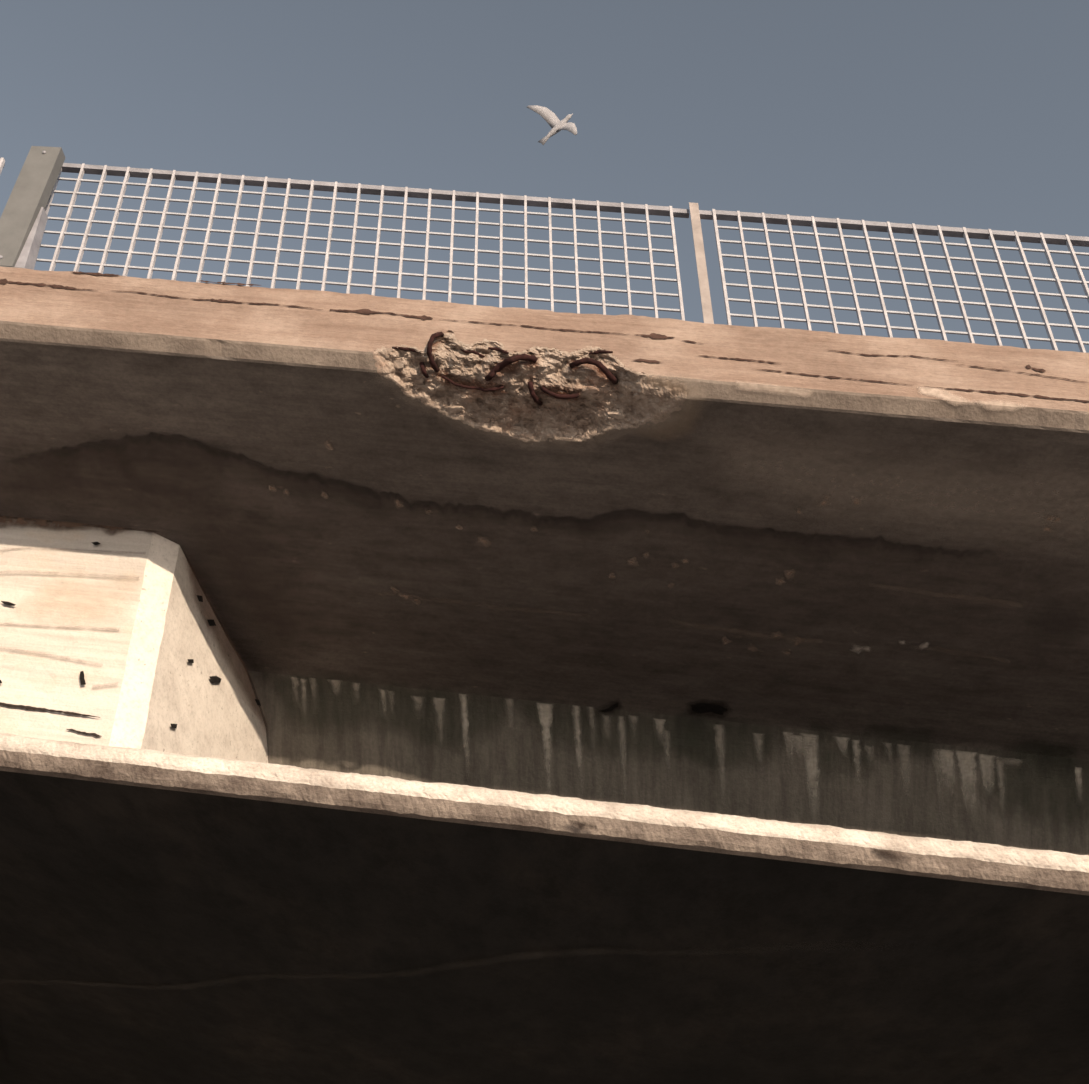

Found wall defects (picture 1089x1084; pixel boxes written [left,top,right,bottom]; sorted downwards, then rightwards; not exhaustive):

spalling [373,332,687,442]
damp [291,677,315,699]
damp [412,696,445,722]
damp [460,694,468,746]
damp [537,703,553,759]
damp [573,705,637,765]
damp [714,724,723,756]
damp [783,732,817,786]
damp [835,736,872,764]
damp [884,742,910,775]
damp [934,749,1021,788]